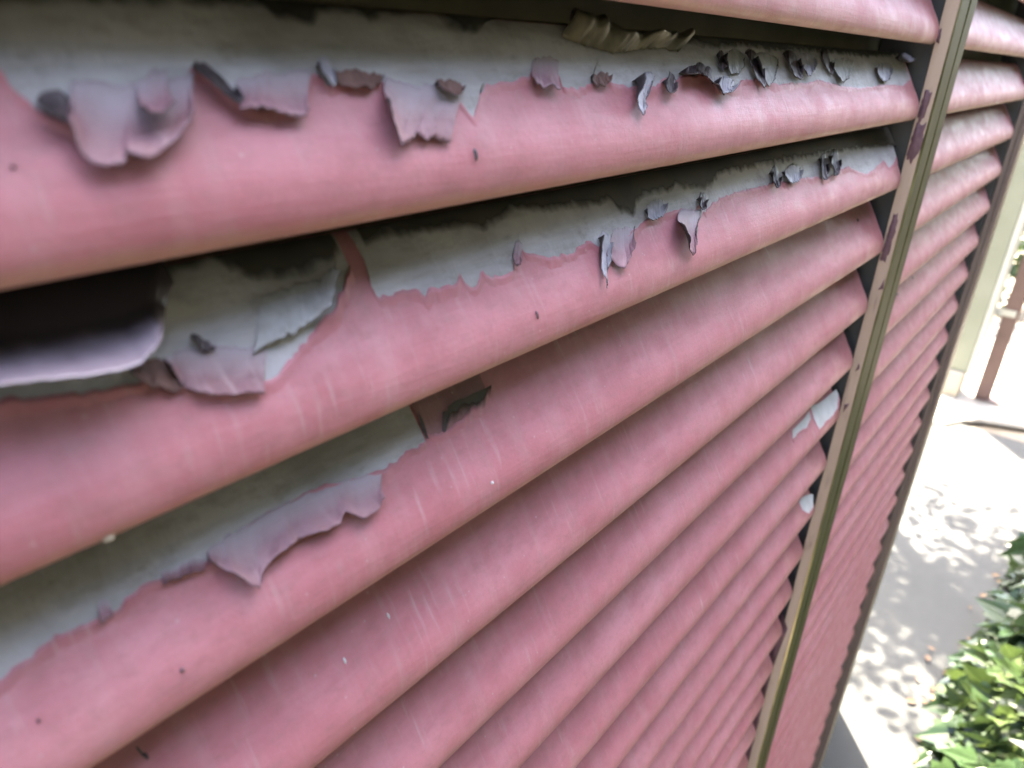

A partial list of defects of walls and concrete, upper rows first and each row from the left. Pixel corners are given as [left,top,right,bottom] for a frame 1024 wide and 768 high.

peeling [0,0,915,168]
peeling [347,126,898,312]
peeling [0,233,354,420]
peeling [0,374,492,697]
peeling [799,494,813,516]
peeling [793,390,840,442]